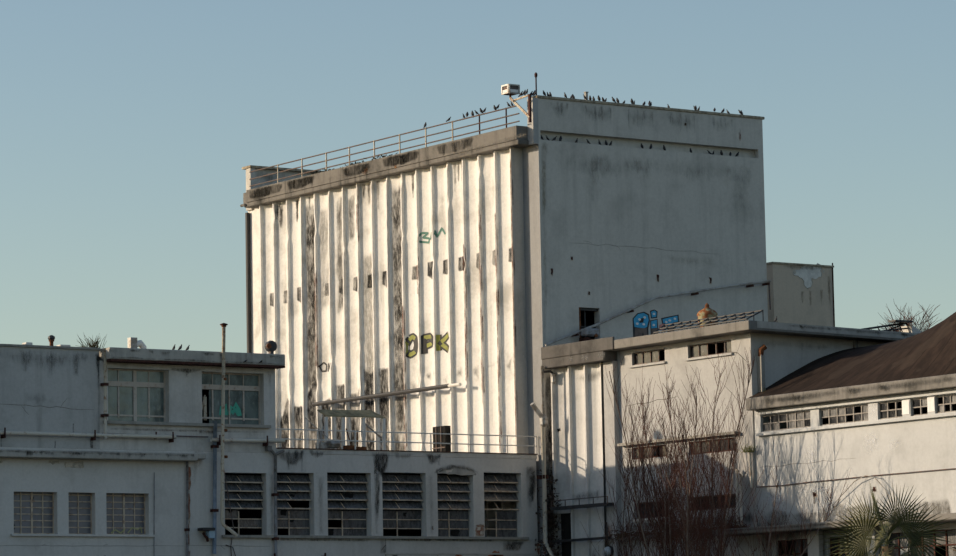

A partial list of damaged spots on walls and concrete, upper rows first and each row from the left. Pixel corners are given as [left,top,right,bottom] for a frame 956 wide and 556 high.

leakage [384,152,417,166]
leakage [344,164,369,176]
leakage [250,177,312,198]
peeling [792,263,824,289]
leakage [270,190,480,514]